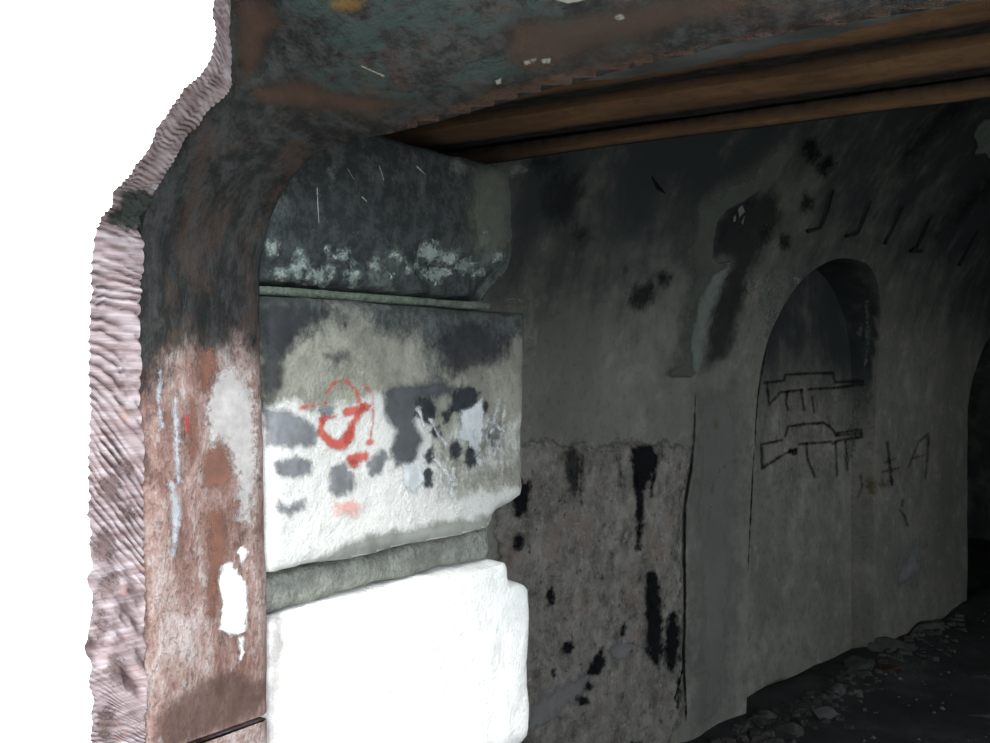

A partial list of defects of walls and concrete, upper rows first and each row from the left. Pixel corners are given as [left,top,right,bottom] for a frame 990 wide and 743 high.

corrosion [185,400,231,490]
corrosion [207,506,227,617]
peeling [218,547,247,660]
spalling [318,439,690,743]
damp [513,534,524,552]
damp [635,459,658,550]
corrosion [162,616,281,743]
damp [663,611,682,709]